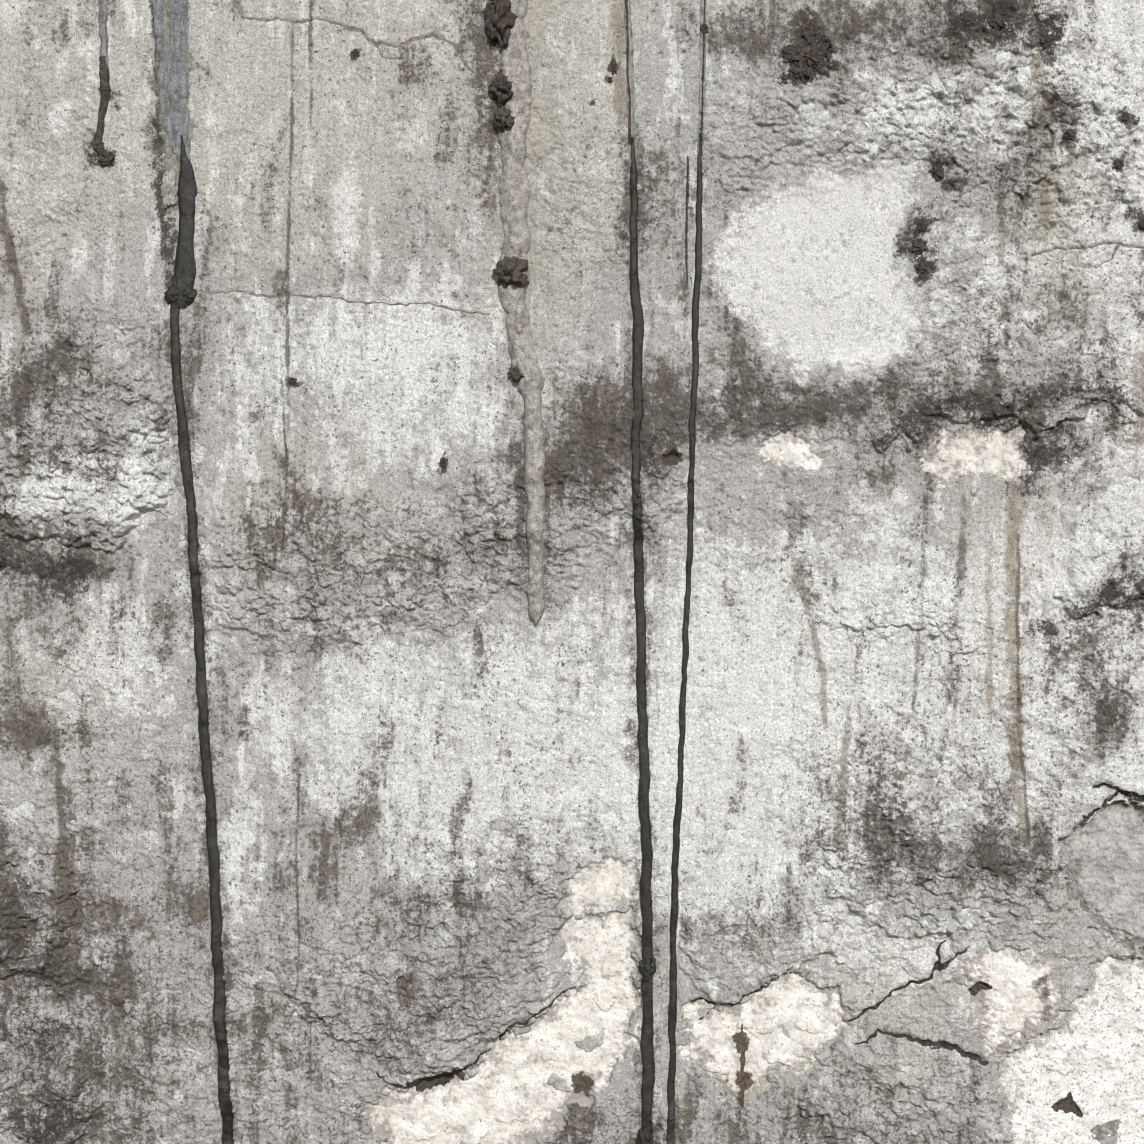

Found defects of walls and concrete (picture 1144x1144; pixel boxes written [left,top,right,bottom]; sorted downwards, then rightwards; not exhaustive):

mould [777,7,839,87]
damp [1116,106,1140,130]
peeling [704,154,929,387]
mould [893,203,940,291]
mould [867,382,1127,497]
crack [1073,783,1144,829]
crack [376,987,576,1089]
spalling [360,857,642,1144]
crack [691,966,793,1021]
corrosion [732,1023,755,1108]
crack [835,940,989,1066]
spalling [957,791,1144,1144]